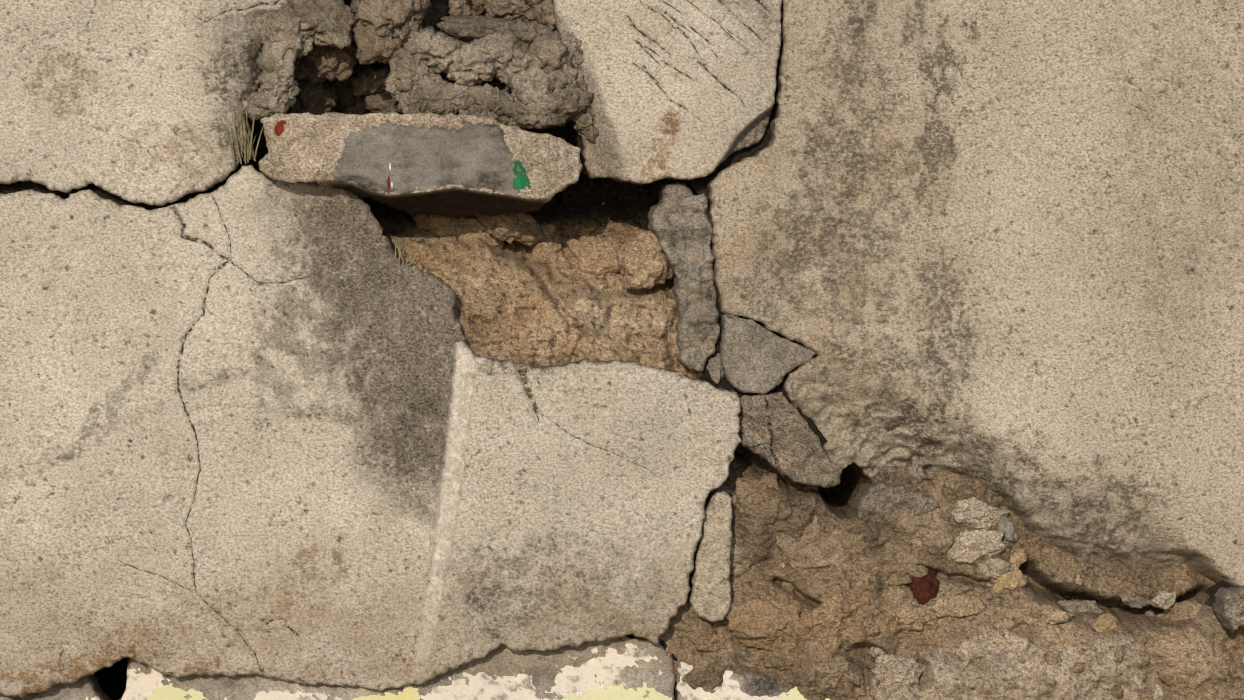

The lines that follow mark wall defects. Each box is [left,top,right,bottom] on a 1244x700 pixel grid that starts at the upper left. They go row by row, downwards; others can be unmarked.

spalling [242,0,599,171]
leakage [760,0,978,324]
spalling [362,170,712,423]
crack [690,63,827,481]
leakage [917,250,975,379]
crack [0,159,310,672]
leakage [848,401,958,449]
spalling [246,445,1244,700]
leakage [1069,476,1160,555]
crack [1205,579,1234,603]
peeling [121,666,208,700]